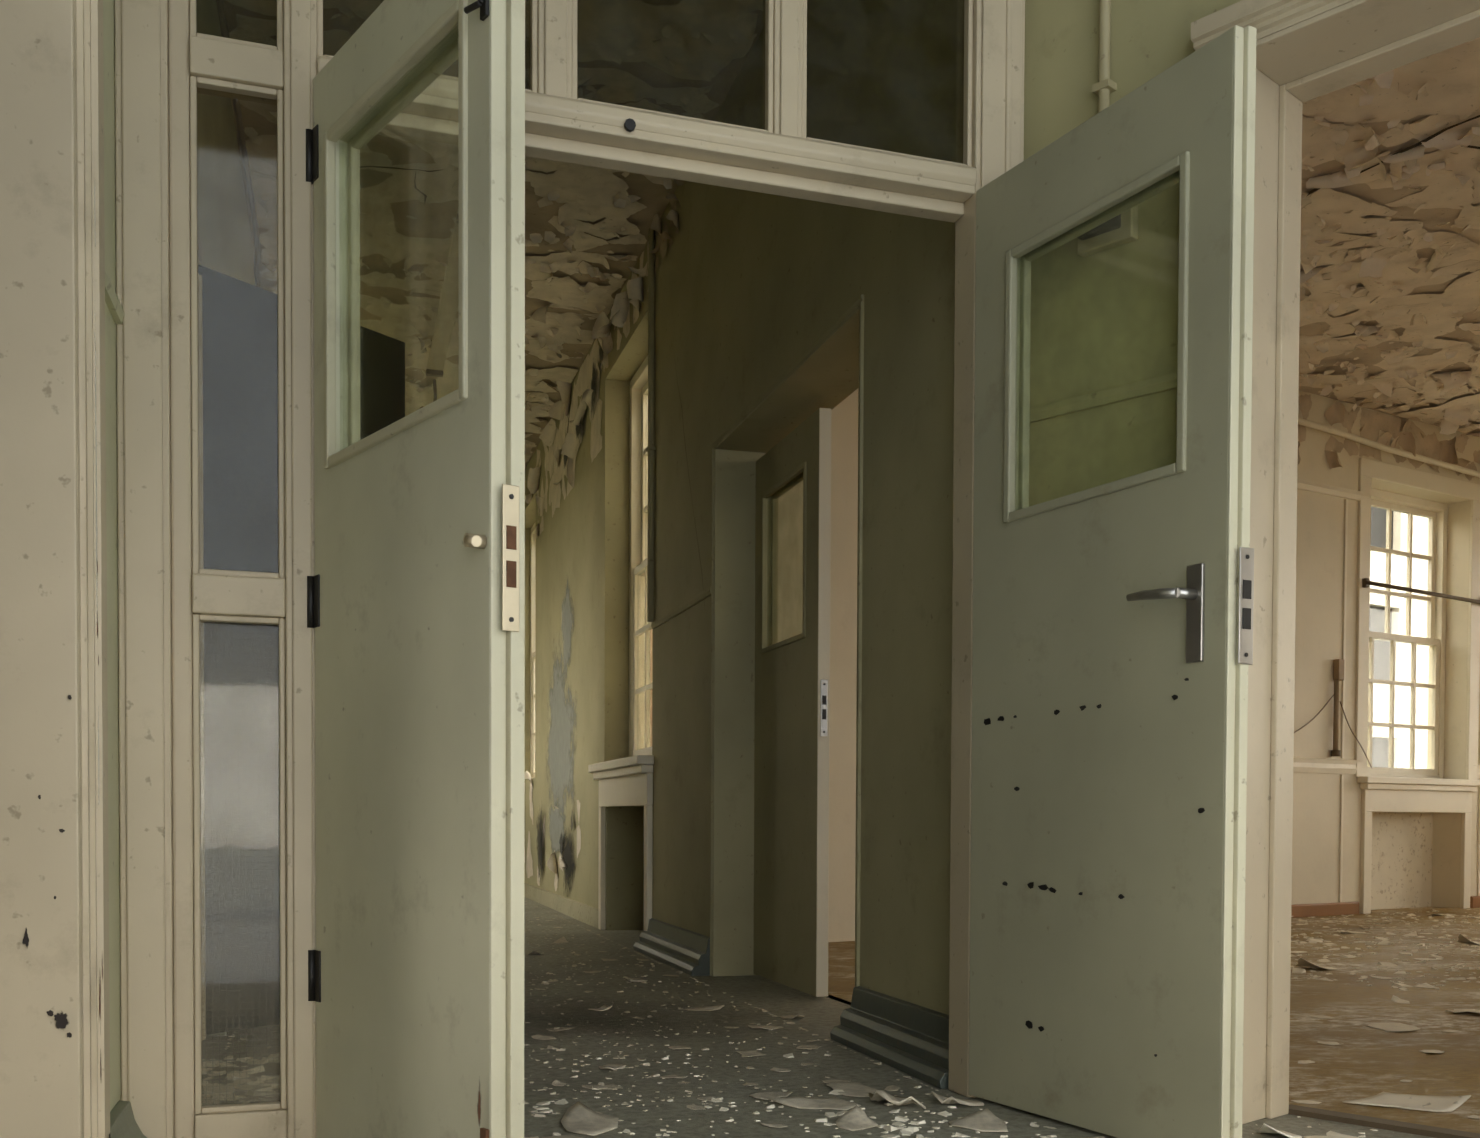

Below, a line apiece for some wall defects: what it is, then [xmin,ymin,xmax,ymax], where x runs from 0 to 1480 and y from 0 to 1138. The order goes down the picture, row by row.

peeling [226,0,277,47]
peeling [239,100,278,294]
peeling [323,0,384,56]
peeling [360,133,459,416]
peeling [525,156,684,539]
peeling [577,0,763,119]
peeling [1298,37,1480,481]
crack [1360,115,1480,173]
flaking render [525,580,581,891]